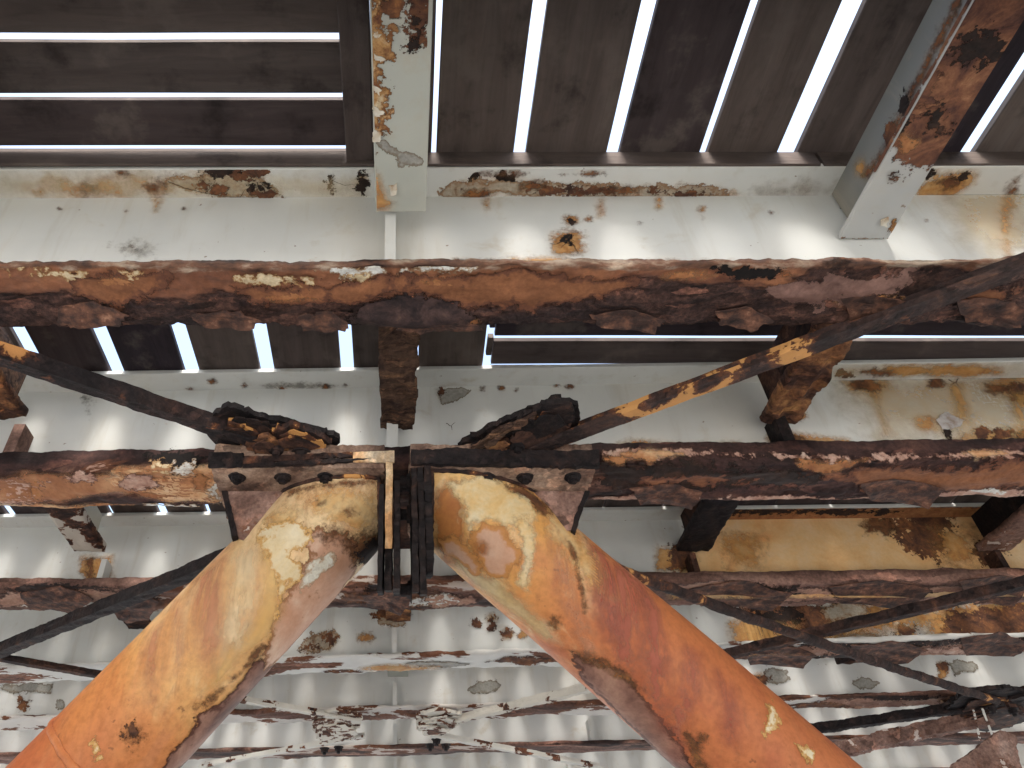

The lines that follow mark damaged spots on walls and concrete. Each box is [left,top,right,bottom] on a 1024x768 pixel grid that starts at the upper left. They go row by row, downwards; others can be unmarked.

peeling [371,0,424,168]
corrosion [856,0,1024,195]
corrosion [822,364,1024,495]
corrosion [163,550,278,768]
peeling [255,516,358,672]
corrosion [485,479,709,768]
peeling [754,667,791,685]
corrosion [655,507,1024,573]
corrosion [705,594,1024,679]
peeling [825,622,928,664]
peeling [946,689,1024,732]
peeling [949,631,1024,677]